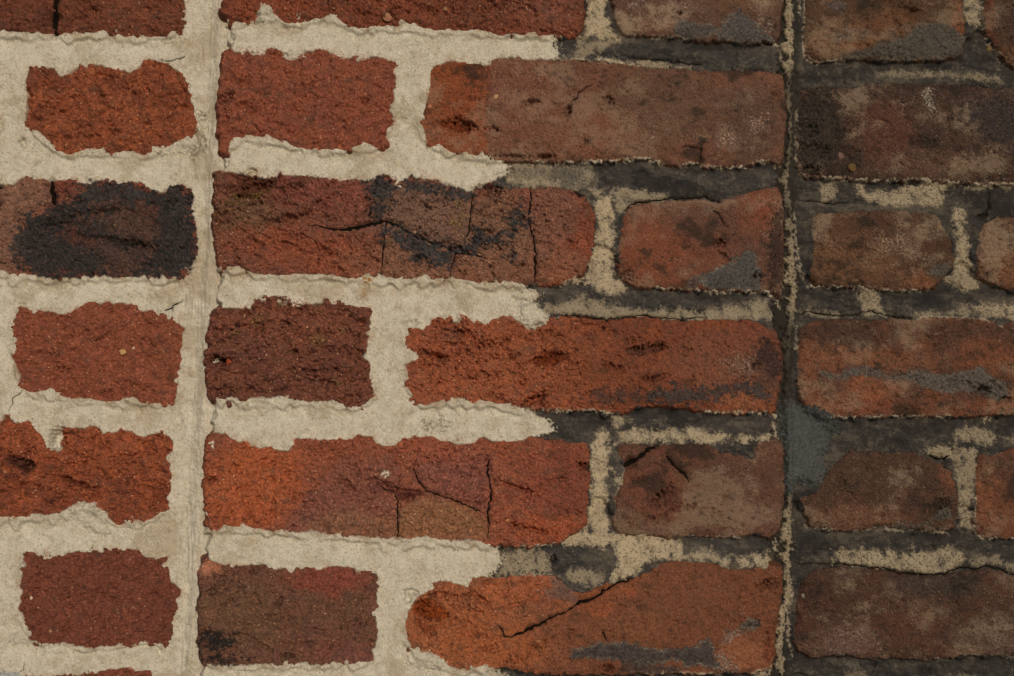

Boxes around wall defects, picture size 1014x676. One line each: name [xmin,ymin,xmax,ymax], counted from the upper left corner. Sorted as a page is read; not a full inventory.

crack [52,0,60,36]
crack [309,197,487,277]
crack [528,188,537,284]
crack [376,482,399,537]
crack [413,460,492,538]
crack [499,579,630,638]